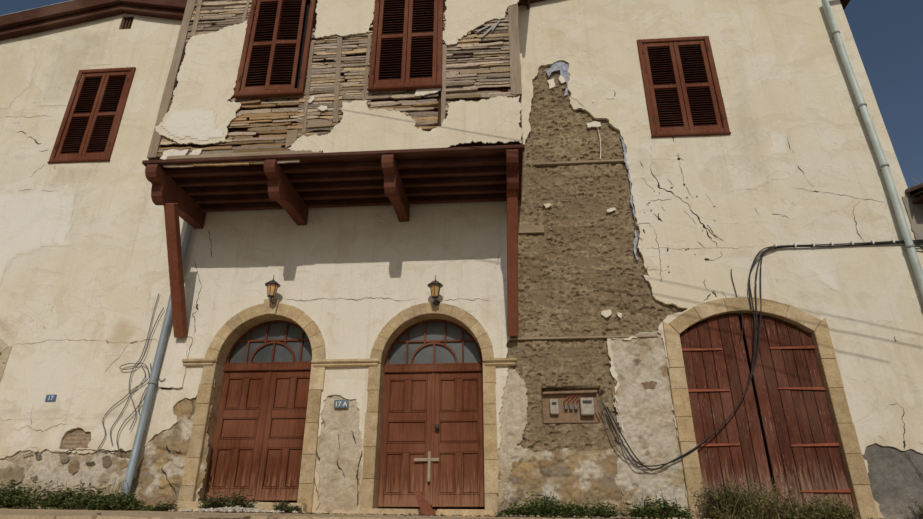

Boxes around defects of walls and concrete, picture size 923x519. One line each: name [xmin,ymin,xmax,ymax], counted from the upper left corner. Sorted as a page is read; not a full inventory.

peeling [160,106,224,160]
peeling [415,88,441,97]
crack [639,137,736,300]
crack [788,143,880,240]
spalling [497,62,688,519]
spalling [0,398,197,515]
spalling [196,404,213,501]
spalling [316,395,362,513]
spalling [863,443,923,519]